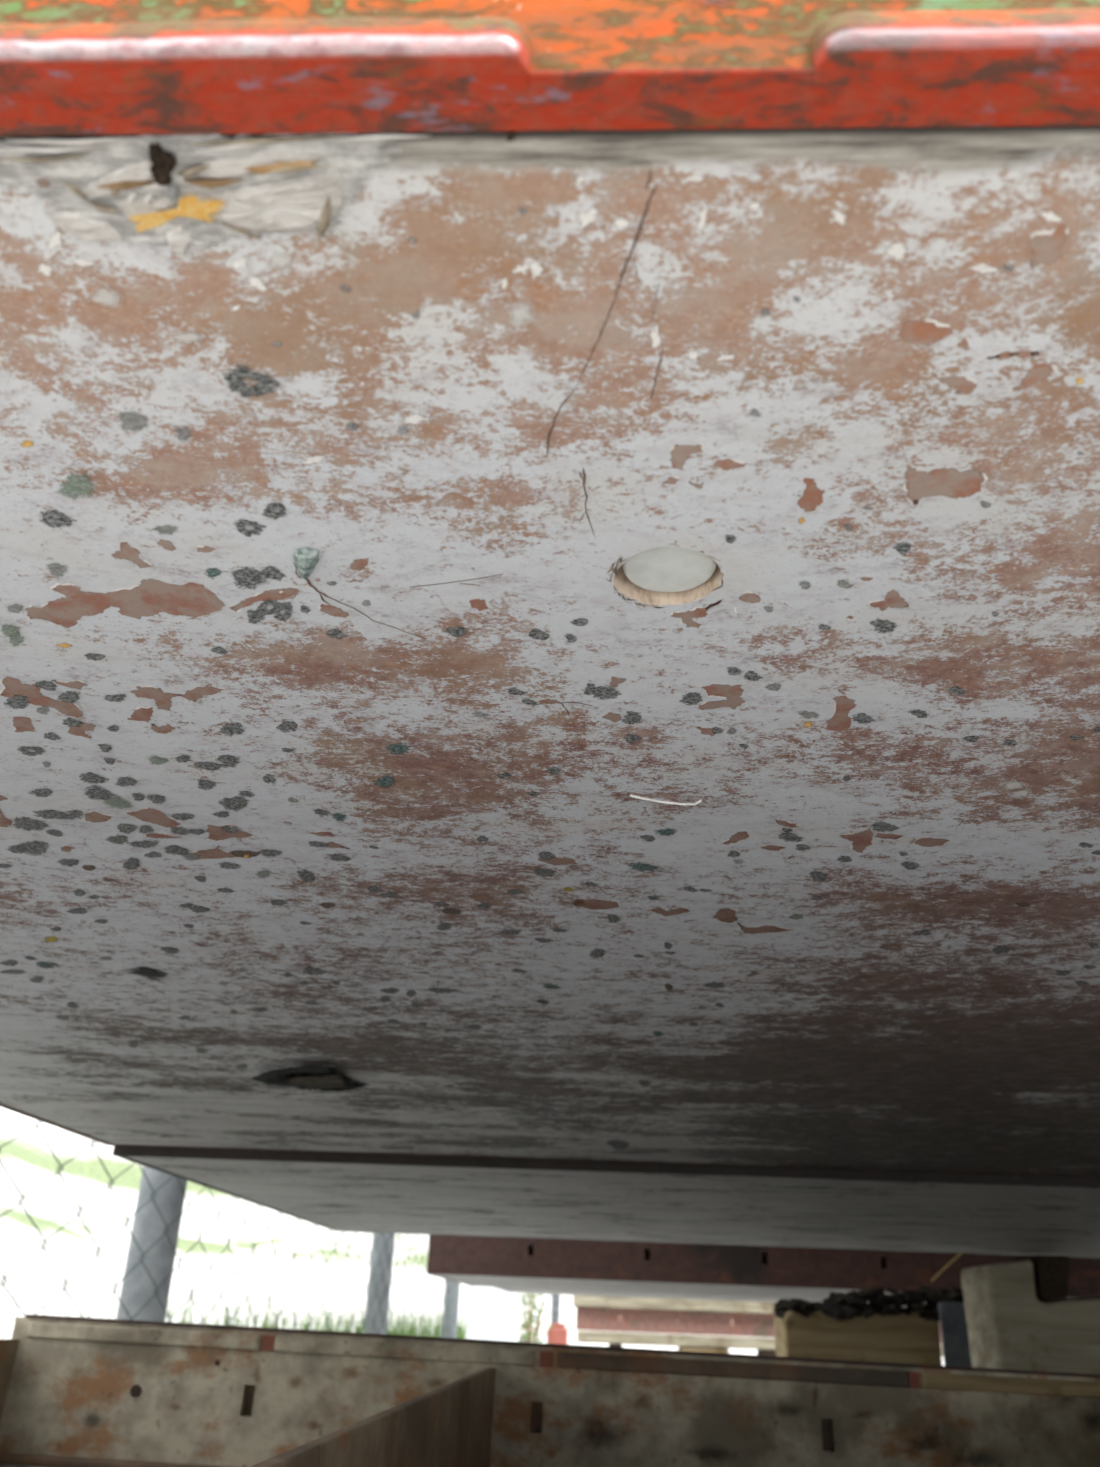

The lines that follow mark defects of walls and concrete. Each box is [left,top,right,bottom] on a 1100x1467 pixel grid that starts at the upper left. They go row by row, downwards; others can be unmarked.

spalling [0,132,432,276]
peeling [232,256,267,293]
crack [546,169,663,458]
crack [580,468,594,534]
peeling [903,466,988,506]
peeling [157,539,176,551]
peeling [26,542,300,629]
spalling [252,1066,367,1092]